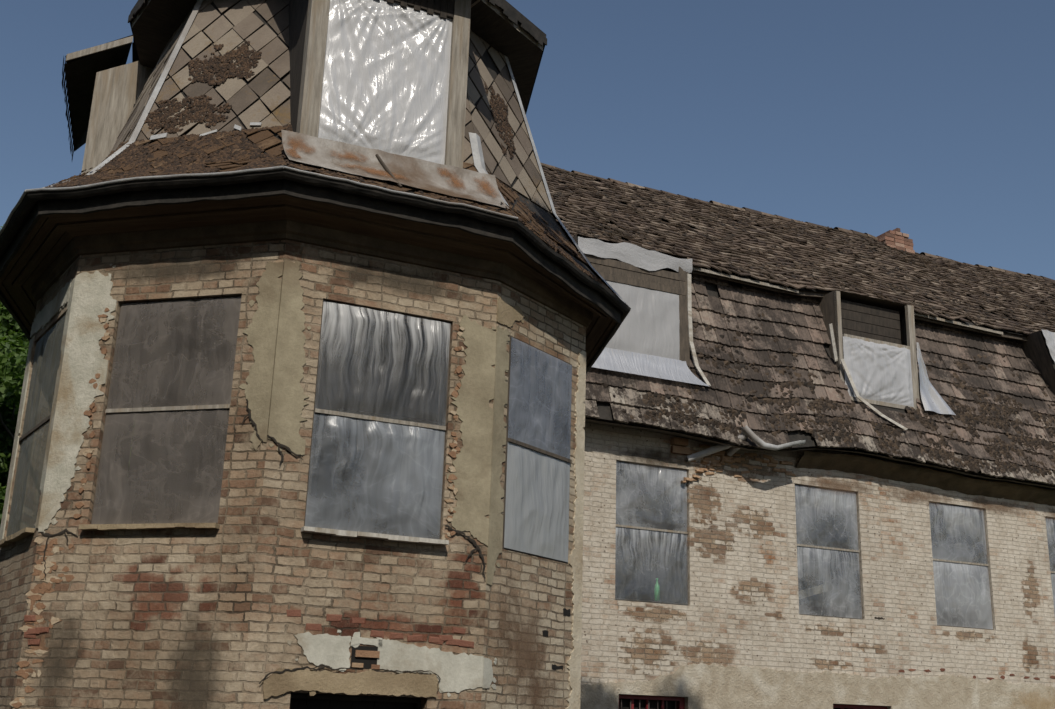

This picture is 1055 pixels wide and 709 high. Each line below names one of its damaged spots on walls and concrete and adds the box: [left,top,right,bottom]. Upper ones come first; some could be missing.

flaking render [239,253,311,455]
flaking render [0,264,117,708]
spalling [681,444,796,559]
peeling [1022,560,1039,616]
flaking render [262,610,497,699]